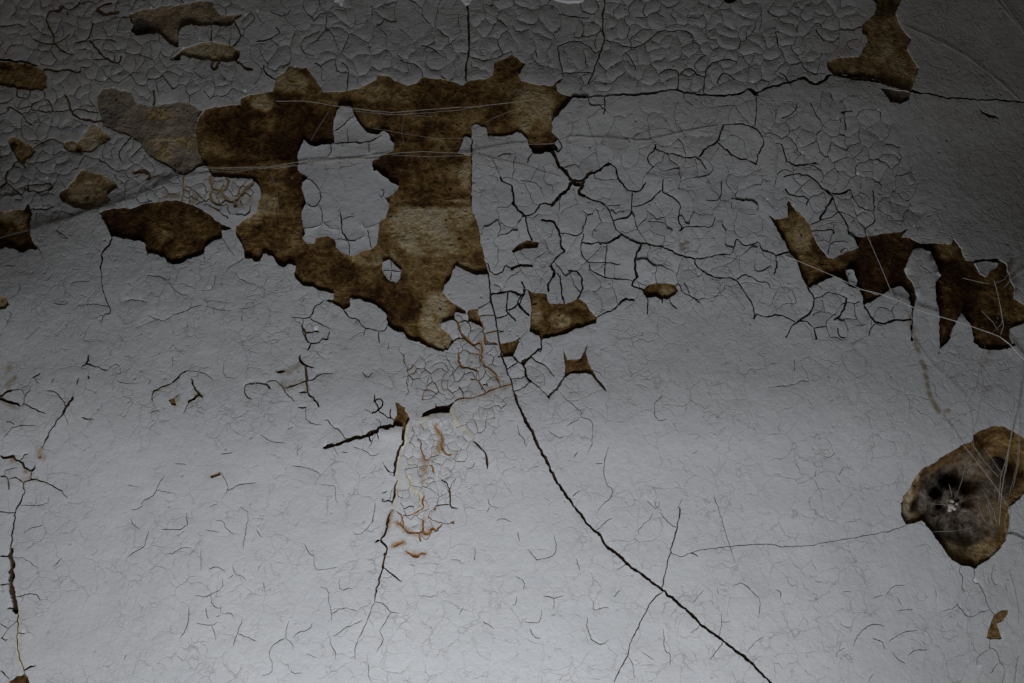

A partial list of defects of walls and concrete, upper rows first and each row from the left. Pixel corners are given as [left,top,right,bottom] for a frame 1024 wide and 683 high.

crack [0,0,262,222]
peeling [129,1,242,62]
peeling [827,0,919,104]
peeling [59,54,608,352]
crack [55,238,256,328]
crack [148,357,230,413]
peeling [563,346,607,392]
crack [244,0,928,683]
peeling [769,201,1024,353]
crack [0,354,129,677]
crack [129,452,260,556]
spalling [901,426,1024,569]